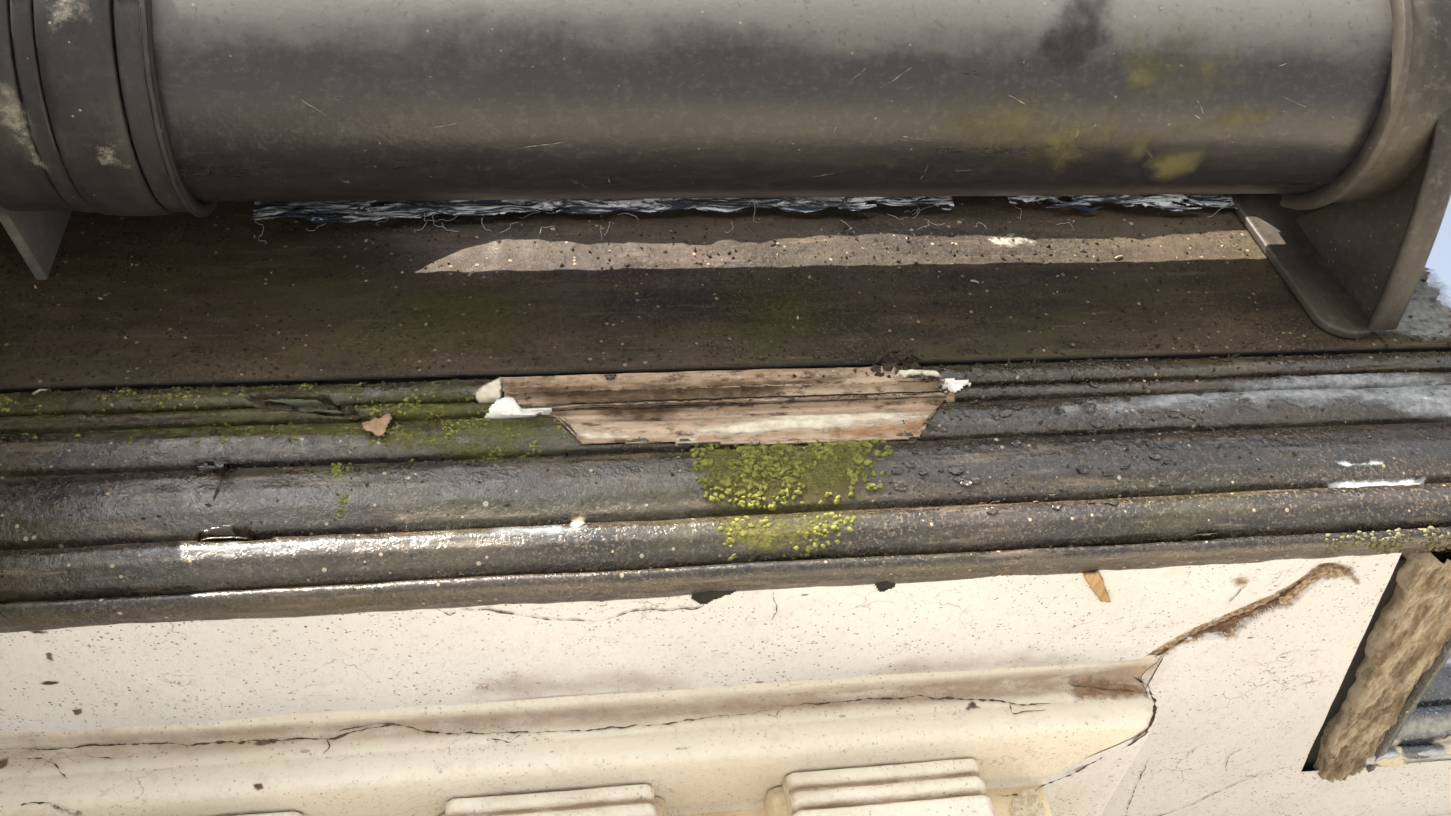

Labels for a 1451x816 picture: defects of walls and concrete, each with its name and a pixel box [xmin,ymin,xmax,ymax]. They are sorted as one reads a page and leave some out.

peeling [476,366,1007,515]
peeling [1045,375,1144,436]
crack [1148,563,1359,657]
crack [0,695,1053,777]
crack [1002,713,1293,816]